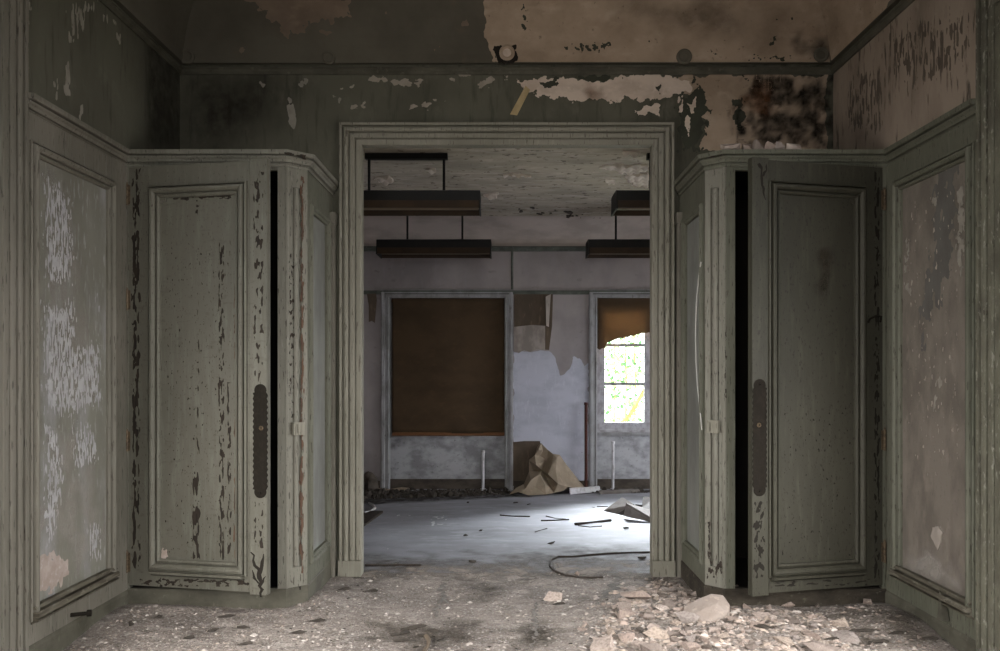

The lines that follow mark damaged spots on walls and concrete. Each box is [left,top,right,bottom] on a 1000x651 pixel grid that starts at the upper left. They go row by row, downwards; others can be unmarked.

peeling [68,0,121,44]
flaking render [244,0,352,39]
peeling [53,61,70,100]
flaking render [287,97,296,129]
flaking render [368,75,423,87]
flaking render [449,0,890,158]
damp [734,64,833,146]
peeling [253,172,264,382]
peeling [904,164,965,459]
peeling [40,173,103,595]
peeling [131,168,249,587]